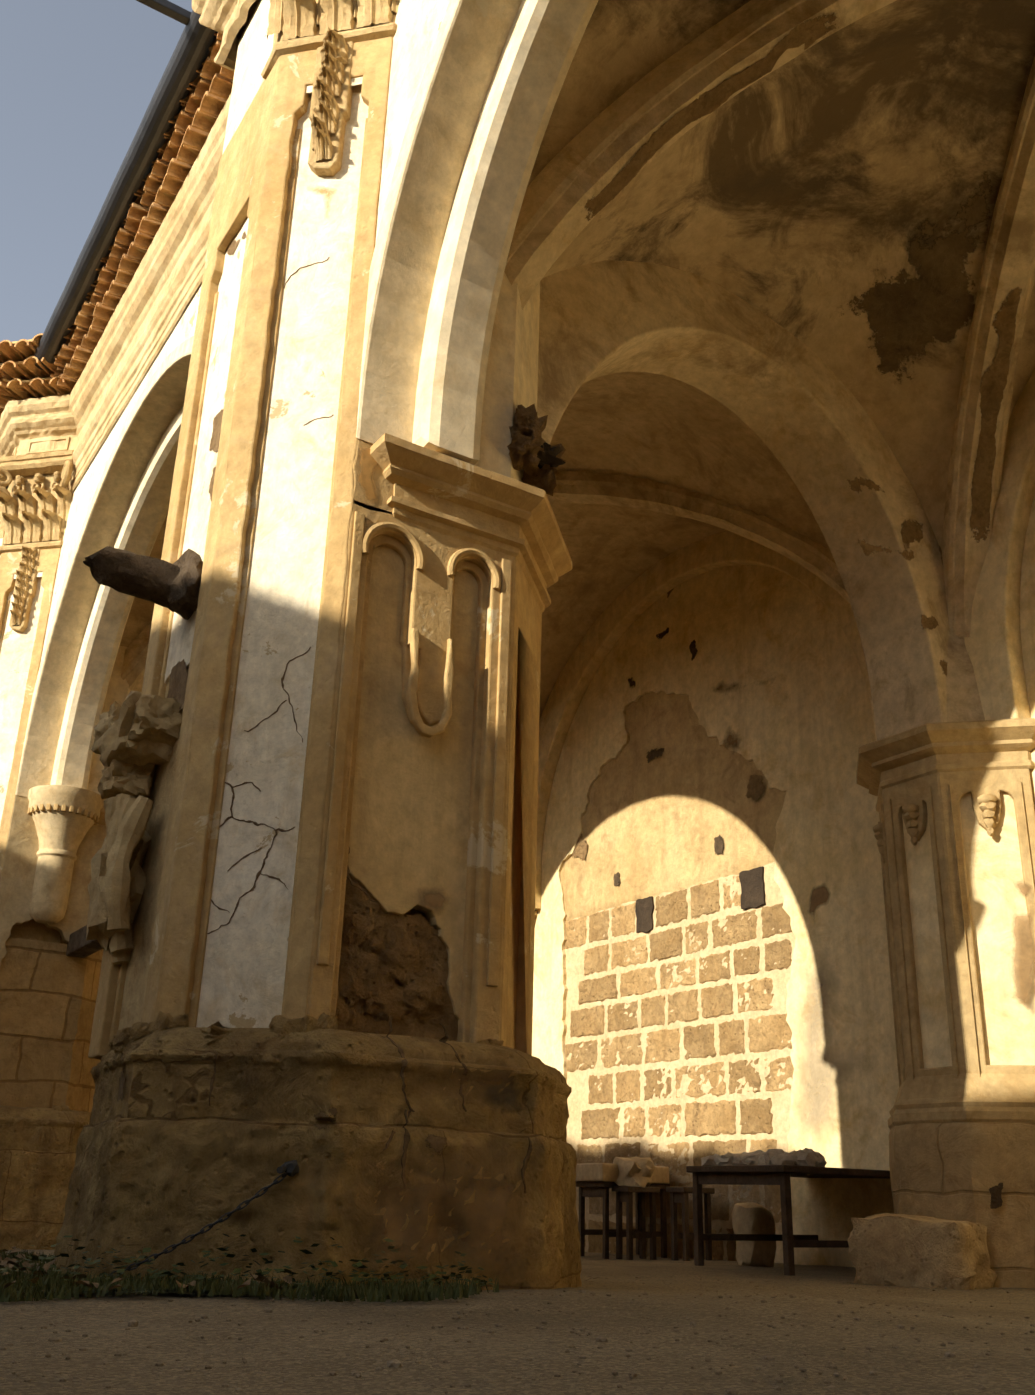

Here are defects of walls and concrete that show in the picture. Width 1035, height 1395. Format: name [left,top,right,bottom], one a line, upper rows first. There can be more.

crack [244,647,311,742]
flaking render [0,937,103,1112]
crack [207,782,295,934]
spalling [335,876,458,1041]
flaking render [561,677,796,1263]
leakage [1017,882,1030,895]
leakage [1013,915,1035,1006]